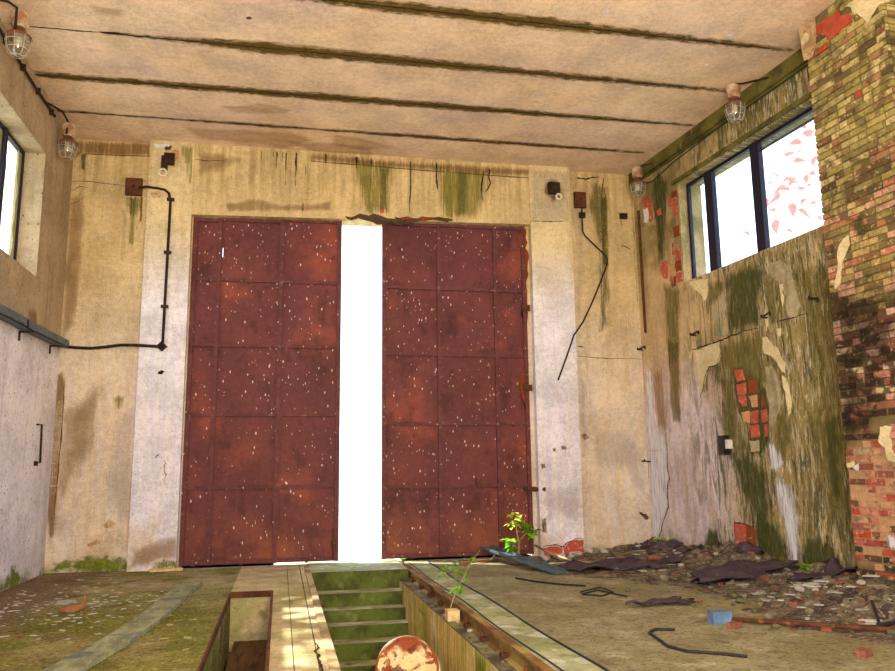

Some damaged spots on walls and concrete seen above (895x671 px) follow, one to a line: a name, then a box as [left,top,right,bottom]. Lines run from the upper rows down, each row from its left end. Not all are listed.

flaking render [799,16,817,61]
flaking render [846,0,891,23]
flaking render [642,190,728,418]
flaking render [734,259,801,456]
flaking render [834,235,850,289]
leakage [48,374,65,536]
flaking render [646,369,669,538]
leakage [769,444,799,560]
flaking render [878,426,895,462]
crack [314,643,324,671]